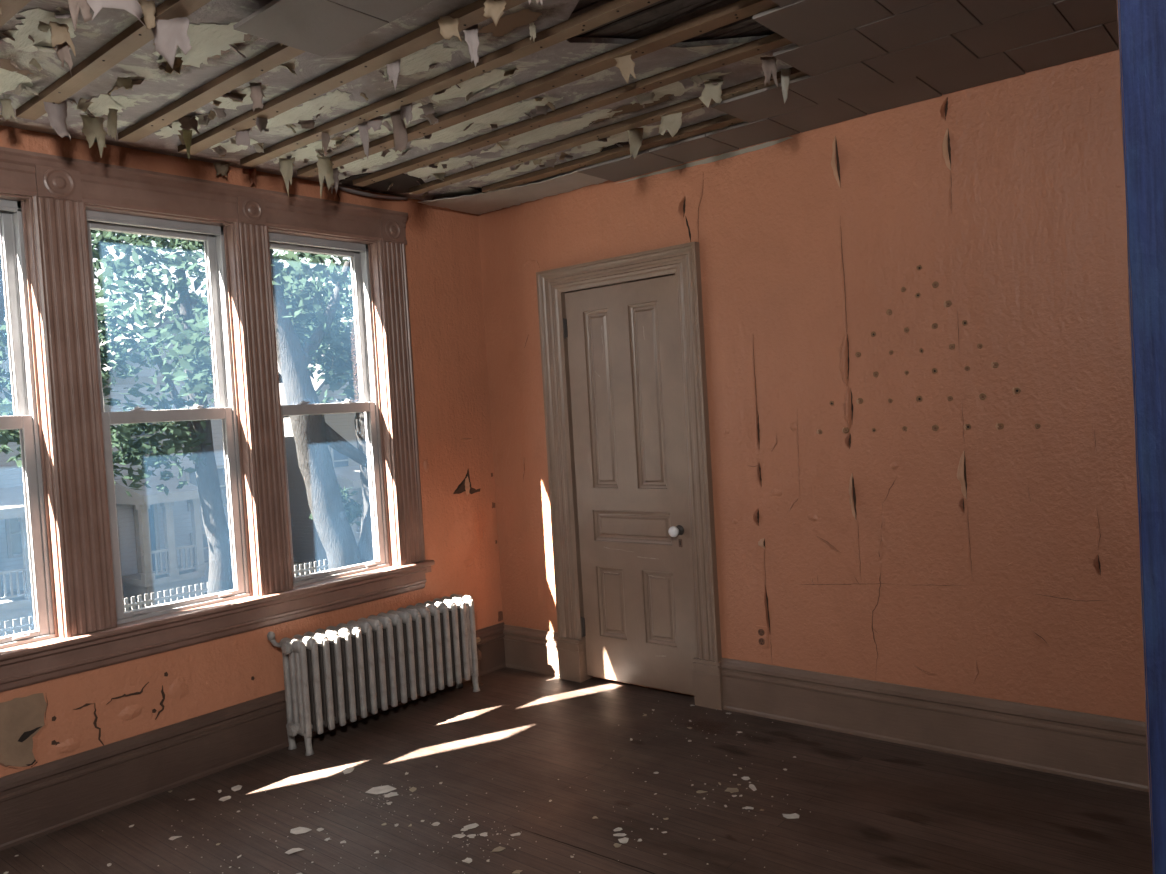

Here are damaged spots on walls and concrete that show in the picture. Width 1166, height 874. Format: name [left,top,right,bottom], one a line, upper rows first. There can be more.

peeling [0,0,247,157]
peeling [155,0,731,200]
peeling [760,56,791,104]
flaking render [619,137,792,183]
crack [685,177,703,242]
spalling [453,469,481,496]
crack [763,477,897,679]
flaking render [0,693,60,770]
crack [73,682,168,746]